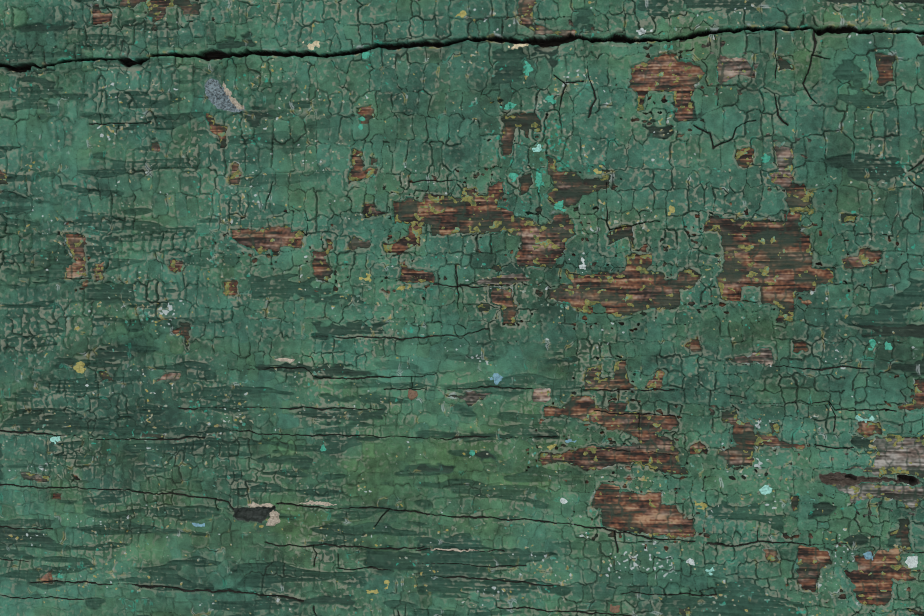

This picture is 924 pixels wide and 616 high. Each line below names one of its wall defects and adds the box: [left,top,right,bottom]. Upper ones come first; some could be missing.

crack [0,26,924,126]
peeling [620,28,759,137]
peeling [215,95,888,332]
peeling [58,222,105,292]
crack [179,367,557,440]
peeling [526,356,810,551]
crack [0,484,234,511]
crack [0,558,317,616]
crack [265,502,847,587]
crack [497,591,717,616]
peeling [781,532,842,592]
peeling [817,415,924,613]